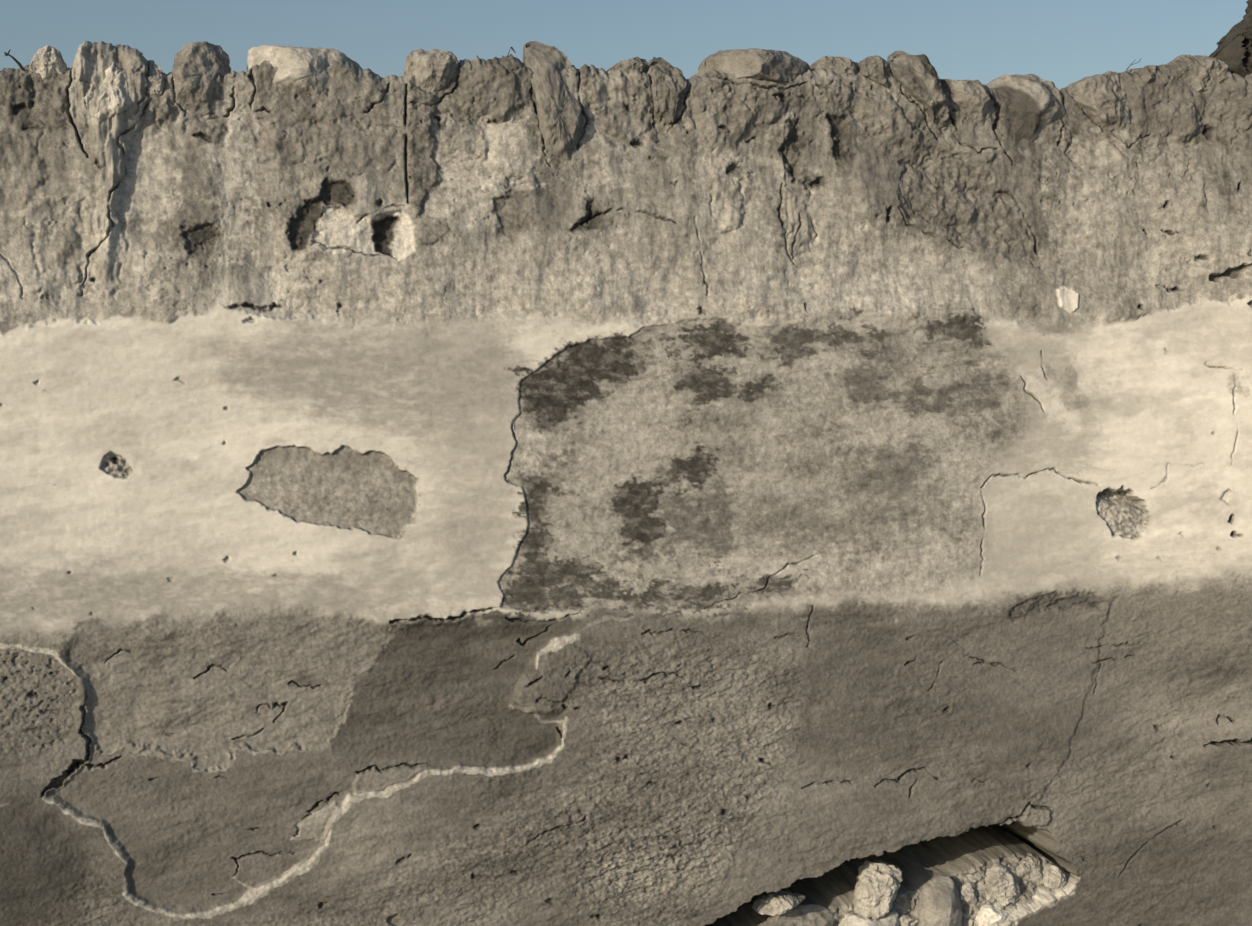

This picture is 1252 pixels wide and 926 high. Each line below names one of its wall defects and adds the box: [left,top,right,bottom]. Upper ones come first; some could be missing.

spalling [267,80,452,263]
damp [197,307,888,464]
damp [840,306,1012,508]
crack [390,607,502,623]
peeling [0,302,1105,926]
damp [423,441,860,630]
crack [1204,715,1252,748]
crack [534,815,588,841]